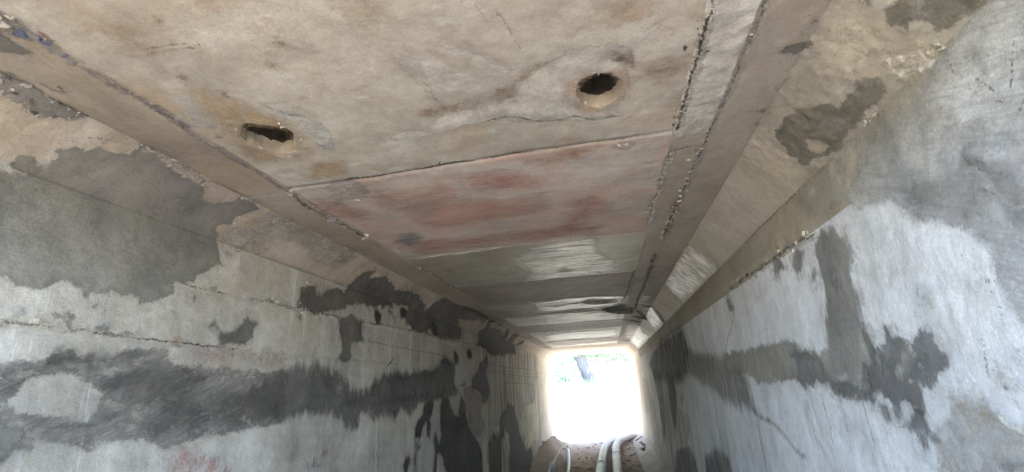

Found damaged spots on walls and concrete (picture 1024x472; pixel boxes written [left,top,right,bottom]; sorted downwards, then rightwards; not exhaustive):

spalling [0,71,88,121]
crack [347,115,631,180]
damp [757,0,987,172]
crack [0,314,239,350]
damp [246,271,539,472]
damp [535,225,949,472]